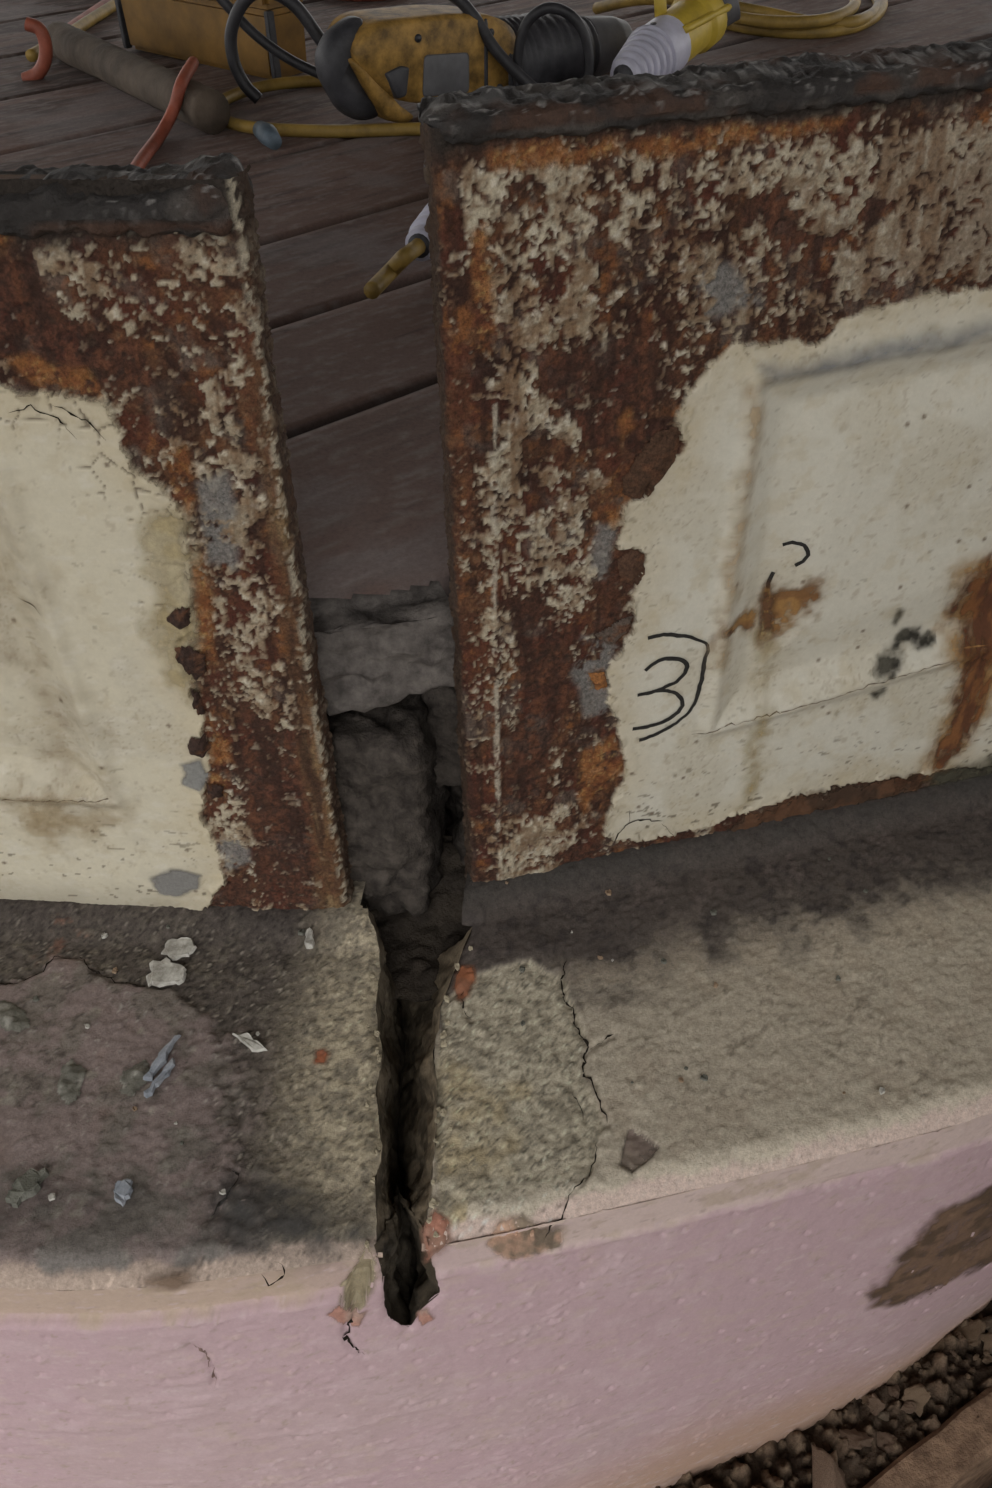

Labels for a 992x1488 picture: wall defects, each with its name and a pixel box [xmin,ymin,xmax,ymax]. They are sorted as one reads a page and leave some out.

rust [0,164,355,911]
rust [419,87,992,882]
crack [261,1263,285,1286]
flaking render [328,1247,376,1326]
crack [342,905,472,1355]
flaking render [422,1211,450,1261]
flaking render [487,1216,562,1260]
crack [545,962,613,1237]